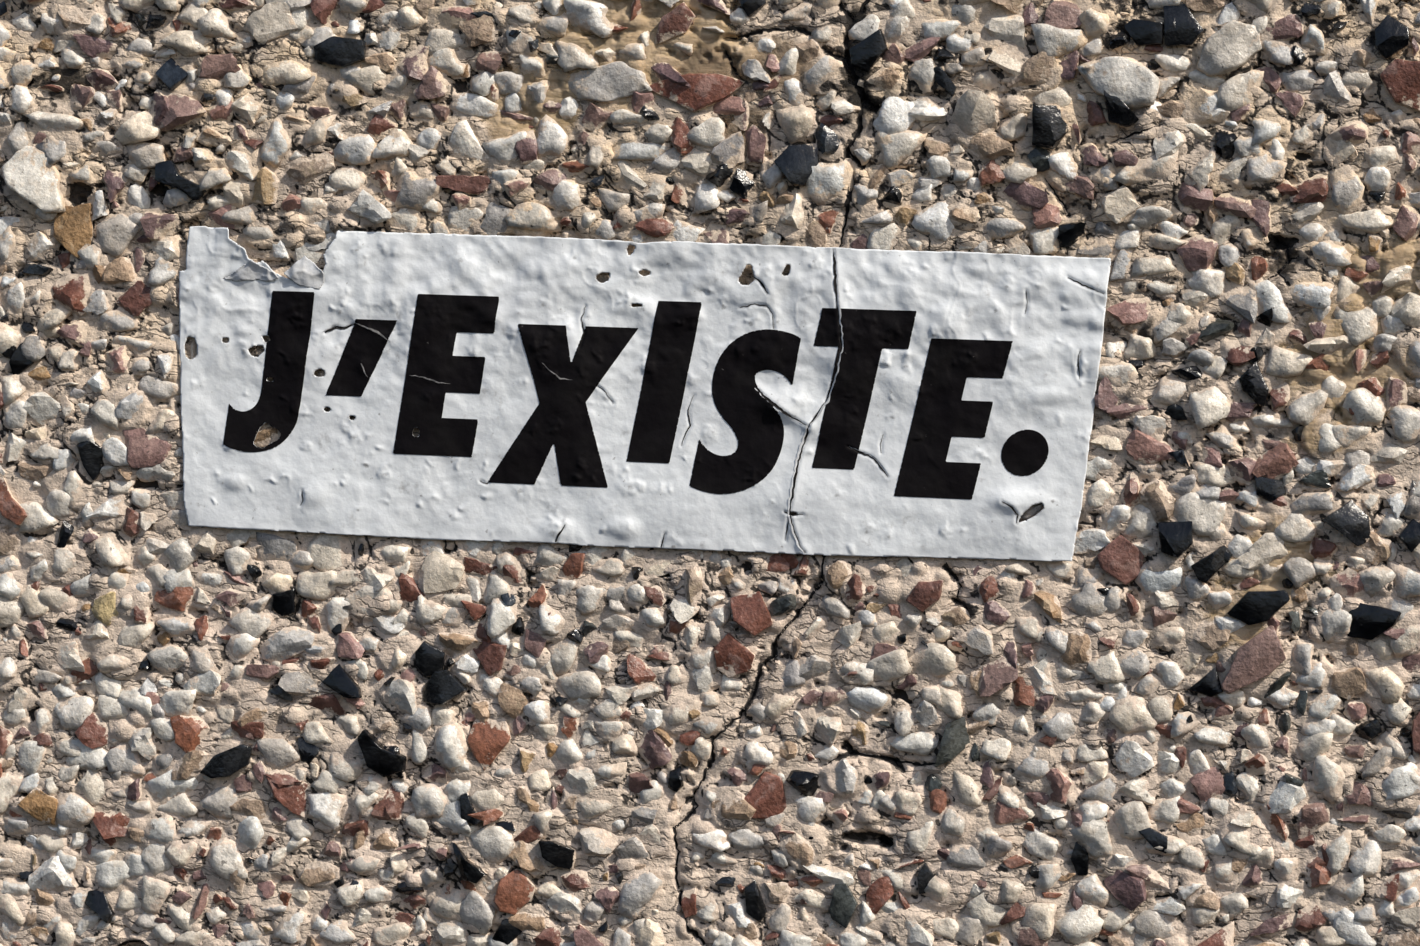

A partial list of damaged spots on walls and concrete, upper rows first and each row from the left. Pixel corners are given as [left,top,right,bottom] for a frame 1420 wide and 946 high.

crack [723,0,885,248]
crack [673,556,825,946]
crack [822,745,935,769]